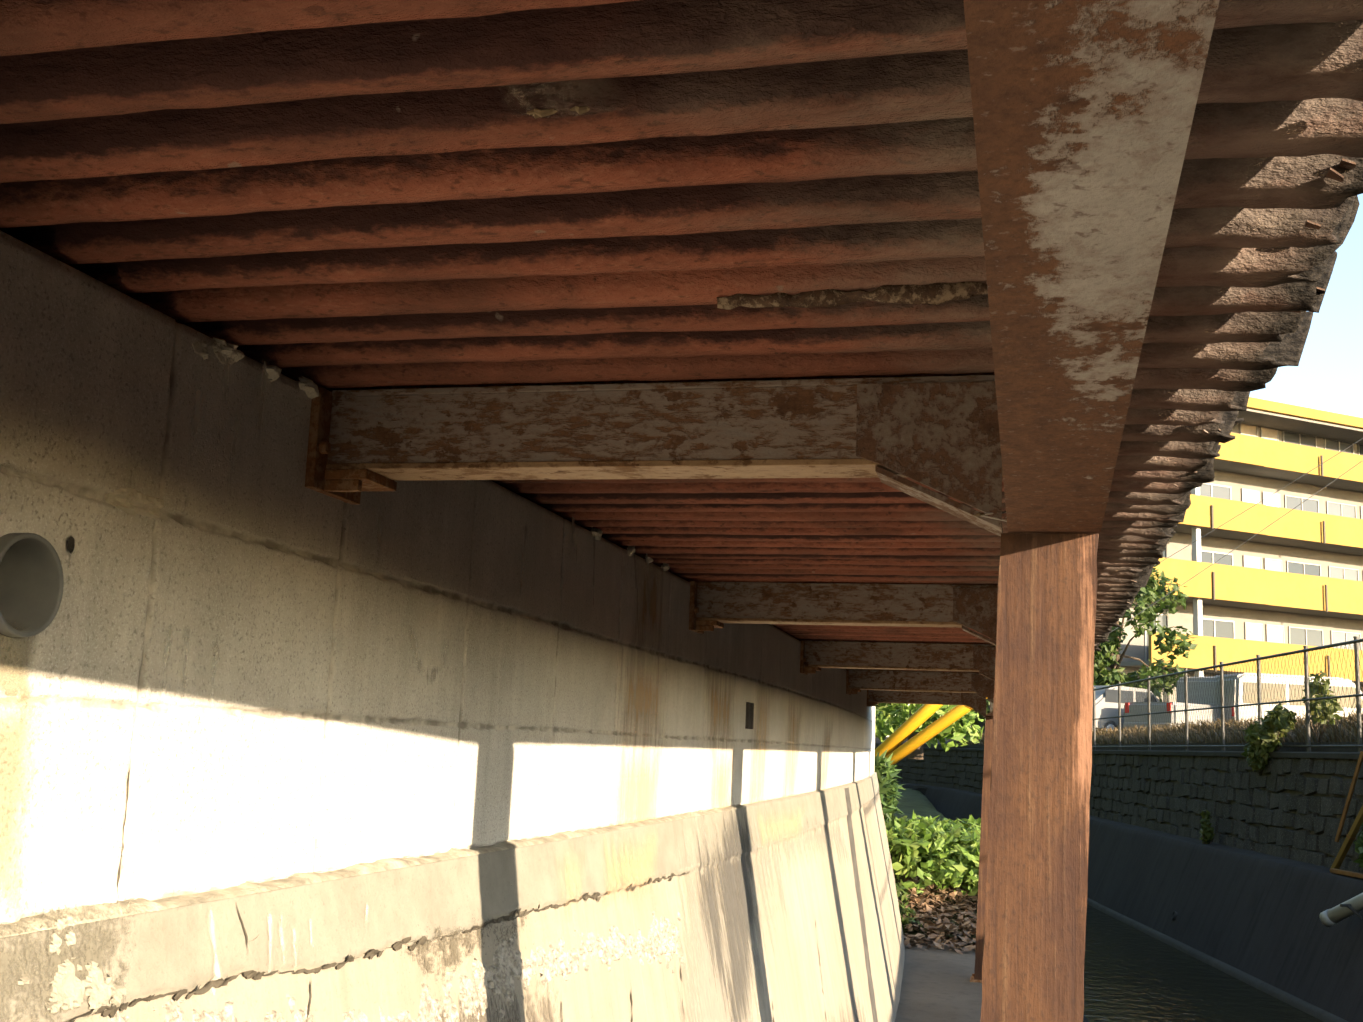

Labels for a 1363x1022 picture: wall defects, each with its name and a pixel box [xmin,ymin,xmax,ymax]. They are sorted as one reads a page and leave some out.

peeling [717,282,988,310]
water stain [0,633,29,698]
water stain [682,798,847,1022]
peeling [40,916,130,1022]
spalling [152,993,314,1022]
spalling [342,910,686,1022]